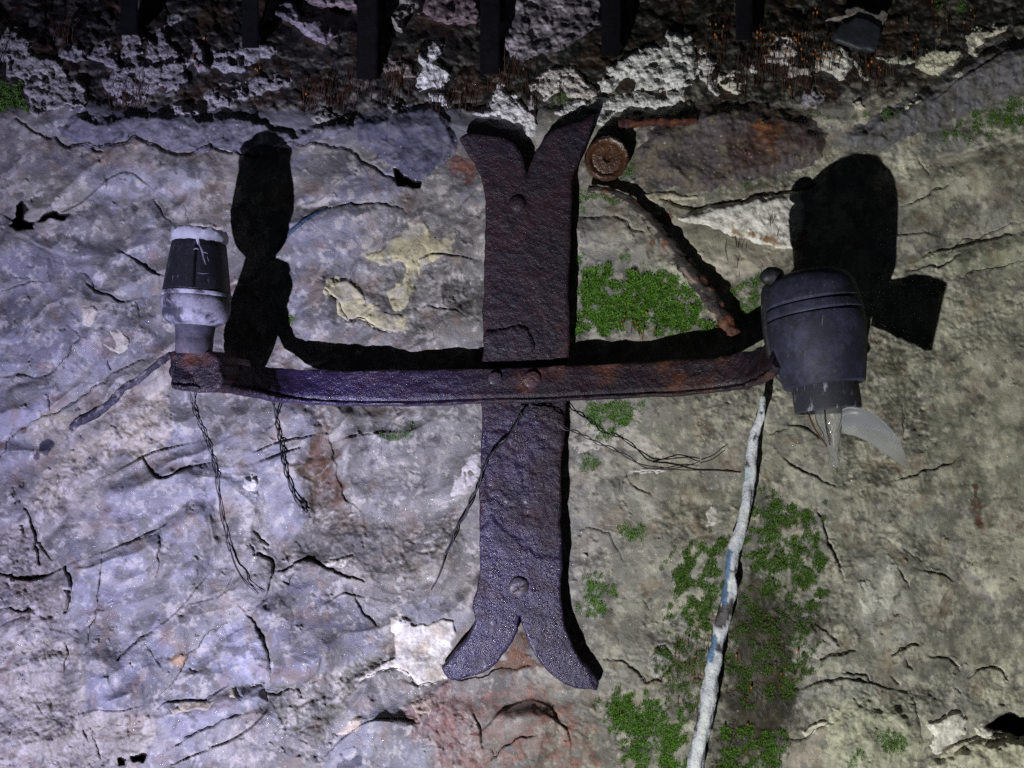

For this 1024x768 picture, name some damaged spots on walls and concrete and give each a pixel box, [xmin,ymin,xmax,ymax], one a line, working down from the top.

crack [16,118,415,209]
corrosion [588,185,742,342]
crack [911,223,1023,277]
corrosion [483,325,535,353]
crack [26,509,73,613]
crack [250,531,375,622]
crack [157,616,301,745]
crack [822,643,1006,693]